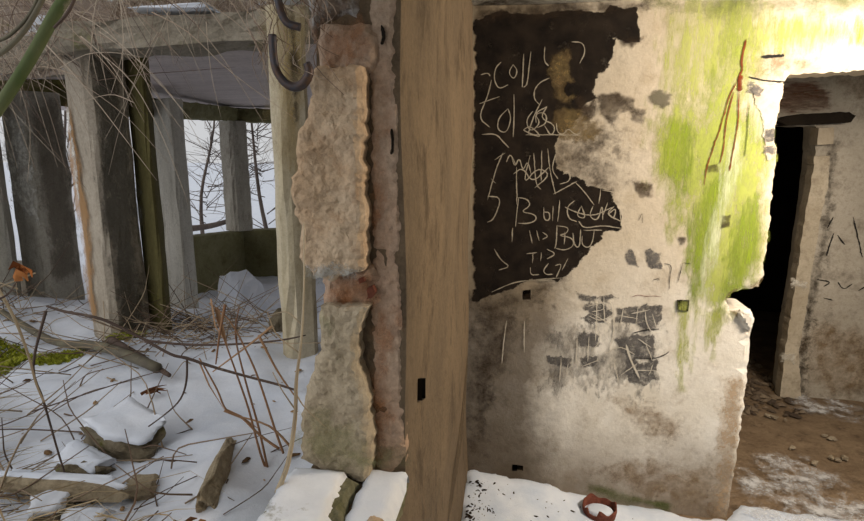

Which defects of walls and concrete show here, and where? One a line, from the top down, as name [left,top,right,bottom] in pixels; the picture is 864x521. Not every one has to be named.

damp [707,0,753,19]
damp [649,90,671,108]
corrosion [704,40,749,184]
spalling [291,23,381,482]
peeling [471,3,644,419]
peeling [635,183,652,196]
damp [679,129,761,302]
peeling [546,291,668,395]
damp [677,305,721,365]